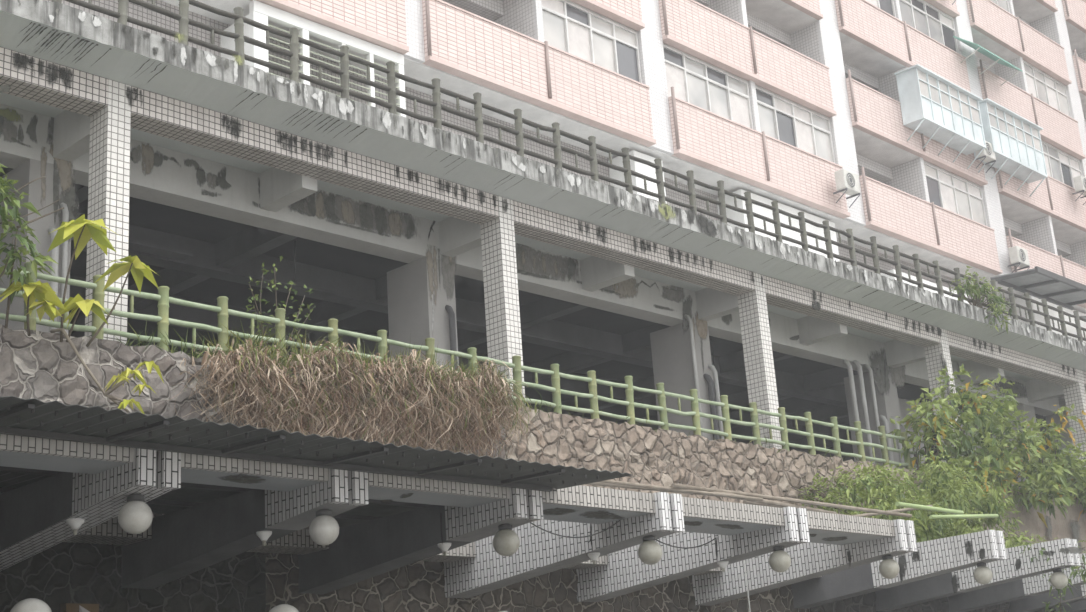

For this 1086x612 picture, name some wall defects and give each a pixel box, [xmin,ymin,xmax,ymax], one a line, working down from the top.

peeling [0,108,54,147]
peeling [130,144,231,197]
peeling [290,191,417,239]
peeling [515,243,582,284]
peeling [601,278,684,311]